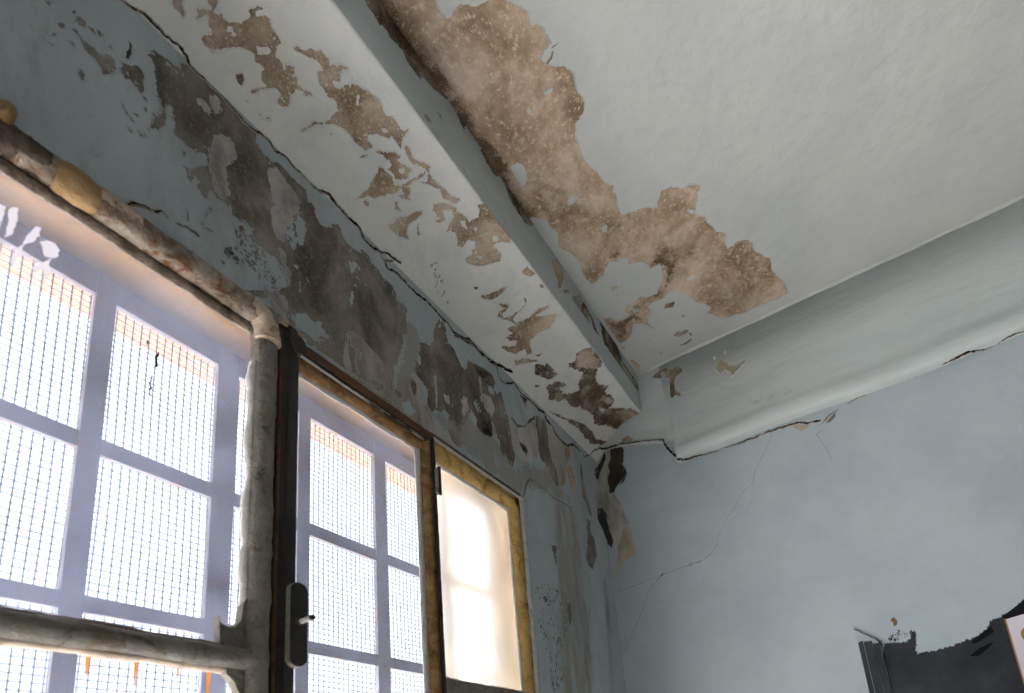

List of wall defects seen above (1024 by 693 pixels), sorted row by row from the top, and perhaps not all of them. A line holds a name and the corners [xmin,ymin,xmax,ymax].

peeling [26,0,788,693]
crack [119,0,887,643]
crack [908,331,1024,380]